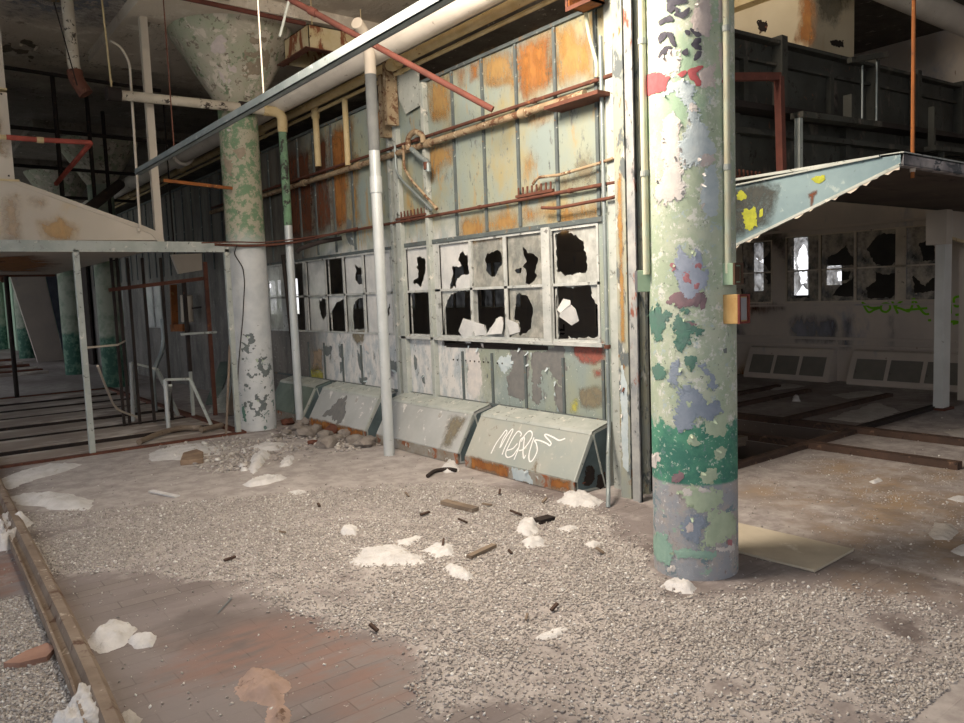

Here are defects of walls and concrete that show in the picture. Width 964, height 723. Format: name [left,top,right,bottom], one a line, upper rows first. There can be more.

corrosion [795,0,848,44]
peeling [210,32,273,84]
corrosion [460,28,590,98]
peeling [654,0,723,219]
corrosion [561,160,595,186]
corrosion [462,209,533,235]
peeling [241,333,272,422]
peeling [465,343,484,398]
peeling [497,345,568,413]
peeling [647,244,737,572]
corrosion [471,457,508,477]
corrosion [550,479,570,490]